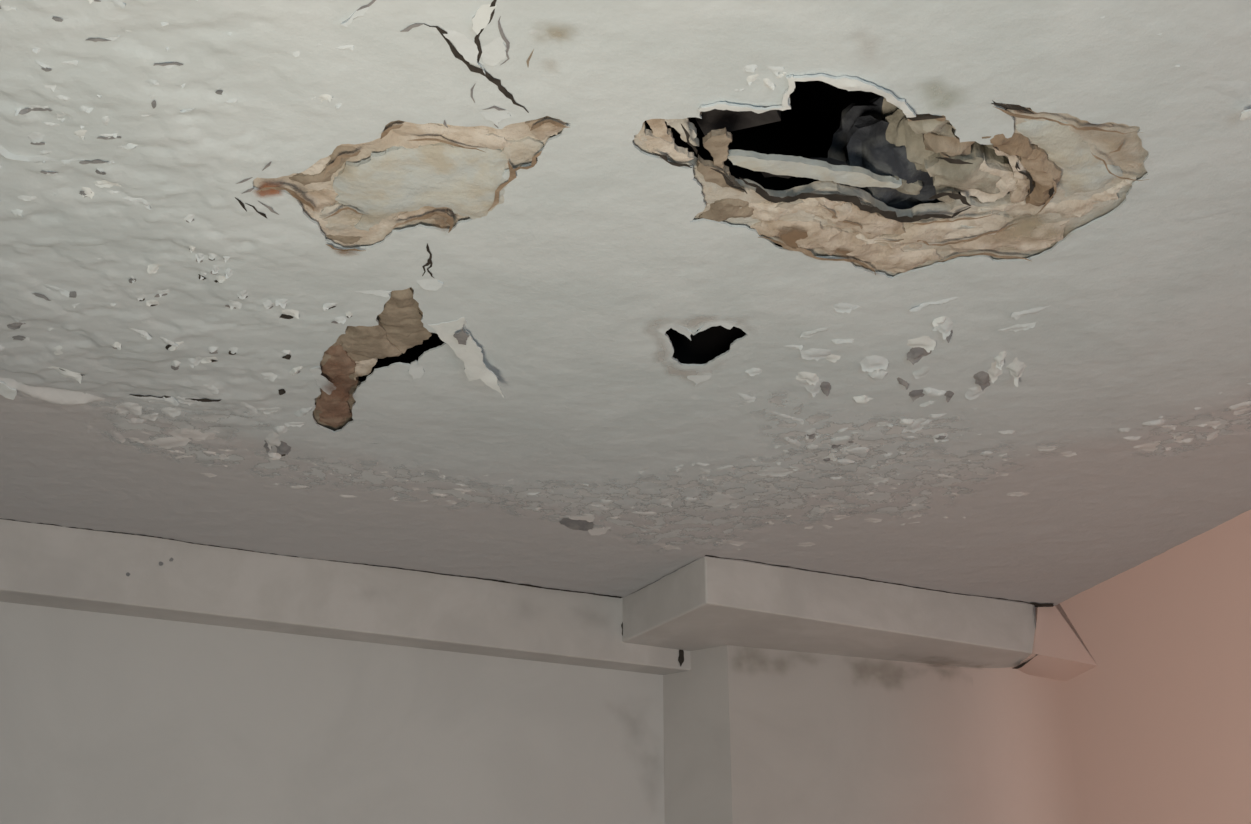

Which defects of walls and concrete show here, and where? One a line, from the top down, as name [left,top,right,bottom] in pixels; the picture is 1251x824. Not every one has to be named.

crack [400,0,529,128]
spalling [667,65,883,191]
spalling [253,116,568,251]
peeling [33,284,80,308]
peeling [129,264,169,307]
peeling [189,246,233,283]
peeling [0,316,30,352]
spalling [666,325,746,364]
spalling [106,287,504,459]
peeling [736,296,1027,484]
peeling [1117,401,1251,454]
spalling [559,515,611,536]